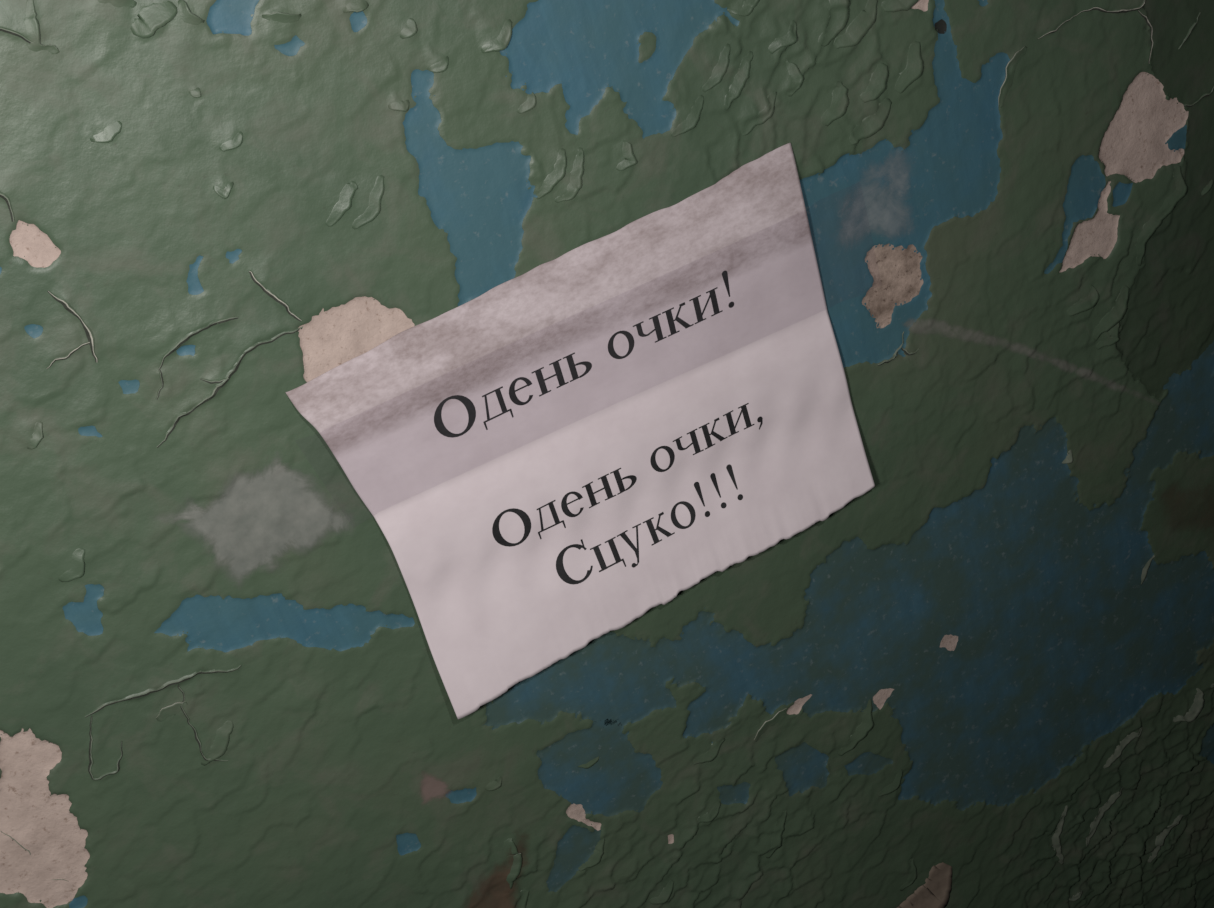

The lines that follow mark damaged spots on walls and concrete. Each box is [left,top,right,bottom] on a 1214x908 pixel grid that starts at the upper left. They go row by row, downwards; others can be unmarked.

peeling [388,0,740,306]
crack [0,192,15,222]
spalling [10,220,61,268]
peeling [326,175,384,230]
crack [46,290,98,369]
crack [156,271,303,448]
spalling [298,296,415,382]
peeling [482,0,1214,831]
water stain [175,464,347,579]
peeling [154,593,415,652]
spalling [0,728,90,908]
peeling [897,862,952,908]